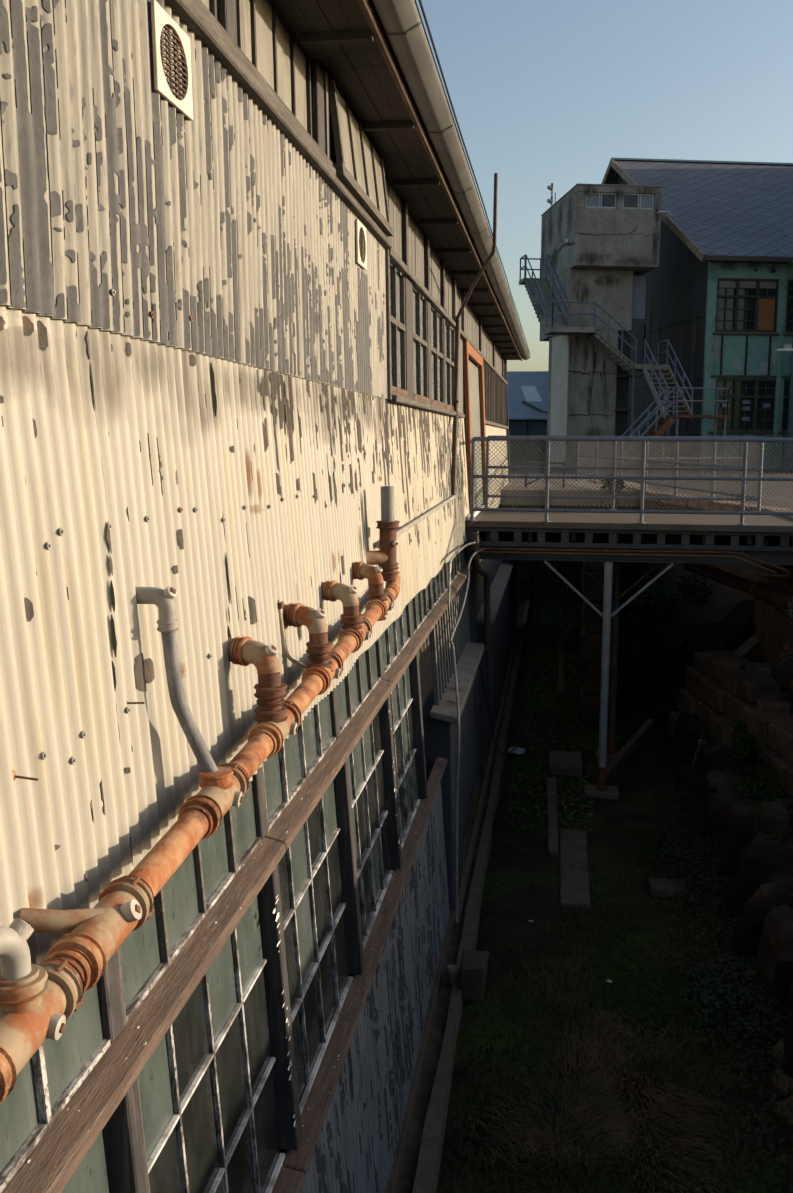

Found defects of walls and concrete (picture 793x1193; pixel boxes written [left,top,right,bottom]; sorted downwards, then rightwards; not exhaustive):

crack [549,224,659,263]
peeling [0,0,467,556]
corrosion [245,457,261,490]
peeling [24,597,34,622]
peeling [235,587,257,625]
peeling [135,653,155,691]
peeling [316,811,447,1193]